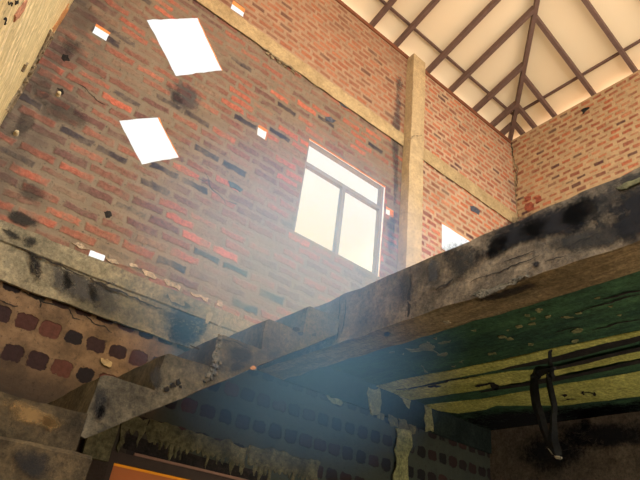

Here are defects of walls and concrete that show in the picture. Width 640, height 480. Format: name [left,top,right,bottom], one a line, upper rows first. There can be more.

crack [510,143,518,214]
leakage [3,229,41,280]
leakage [8,211,37,226]
crack [16,246,162,309]
spalling [129,263,181,291]
crack [471,220,603,282]
leakage [444,172,640,279]
crack [0,291,112,333]
leakage [165,294,245,346]
flaking render [377,328,640,413]